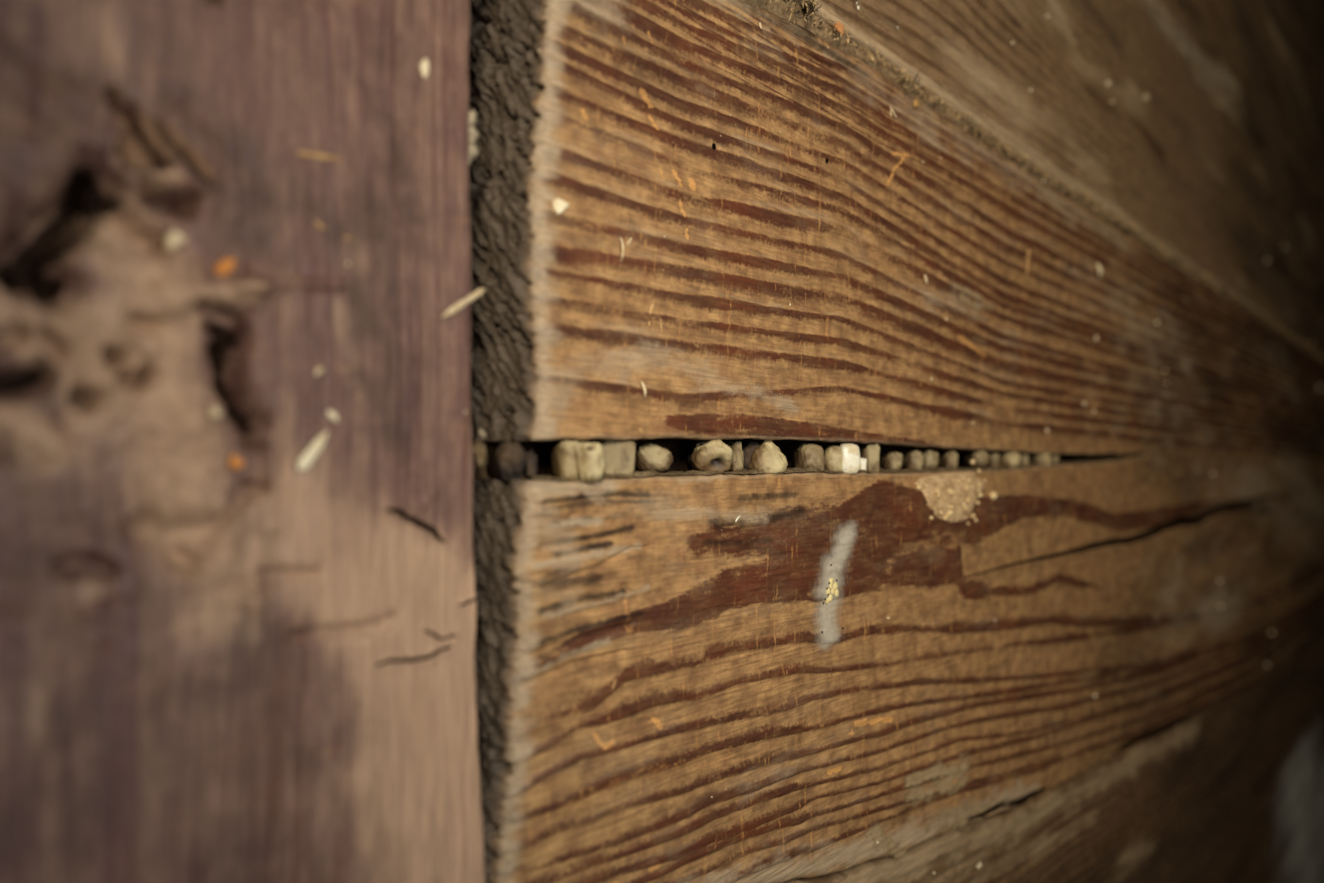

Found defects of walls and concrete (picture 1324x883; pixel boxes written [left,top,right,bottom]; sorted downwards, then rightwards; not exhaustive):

crack [386,509,445,543]
crack [964,494,1283,578]
crack [376,598,476,665]